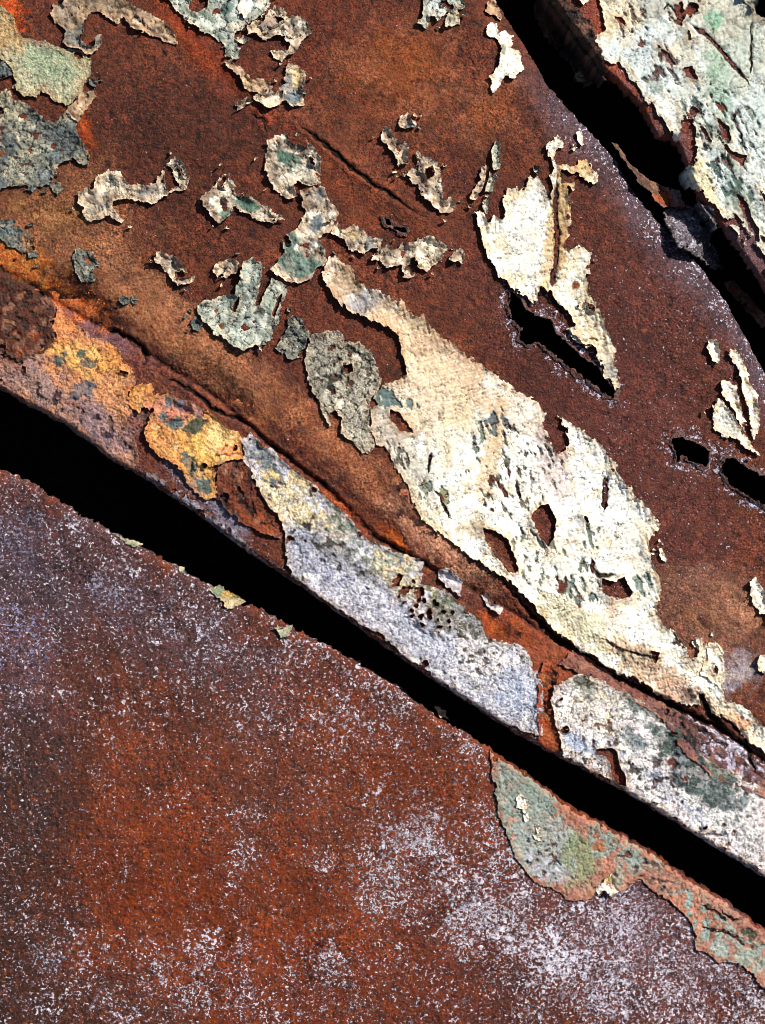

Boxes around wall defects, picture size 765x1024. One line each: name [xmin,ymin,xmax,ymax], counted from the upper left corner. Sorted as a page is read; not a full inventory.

peeling [0,0,313,195]
rust [534,0,609,89]
rust [611,142,685,208]
peeling [580,0,765,256]
crack [664,3,753,151]
crack [106,329,438,574]
rust [215,378,475,578]
peeling [0,112,765,876]
crack [428,453,452,519]
crack [504,583,765,779]
rust [536,648,765,798]
peeling [490,751,765,987]